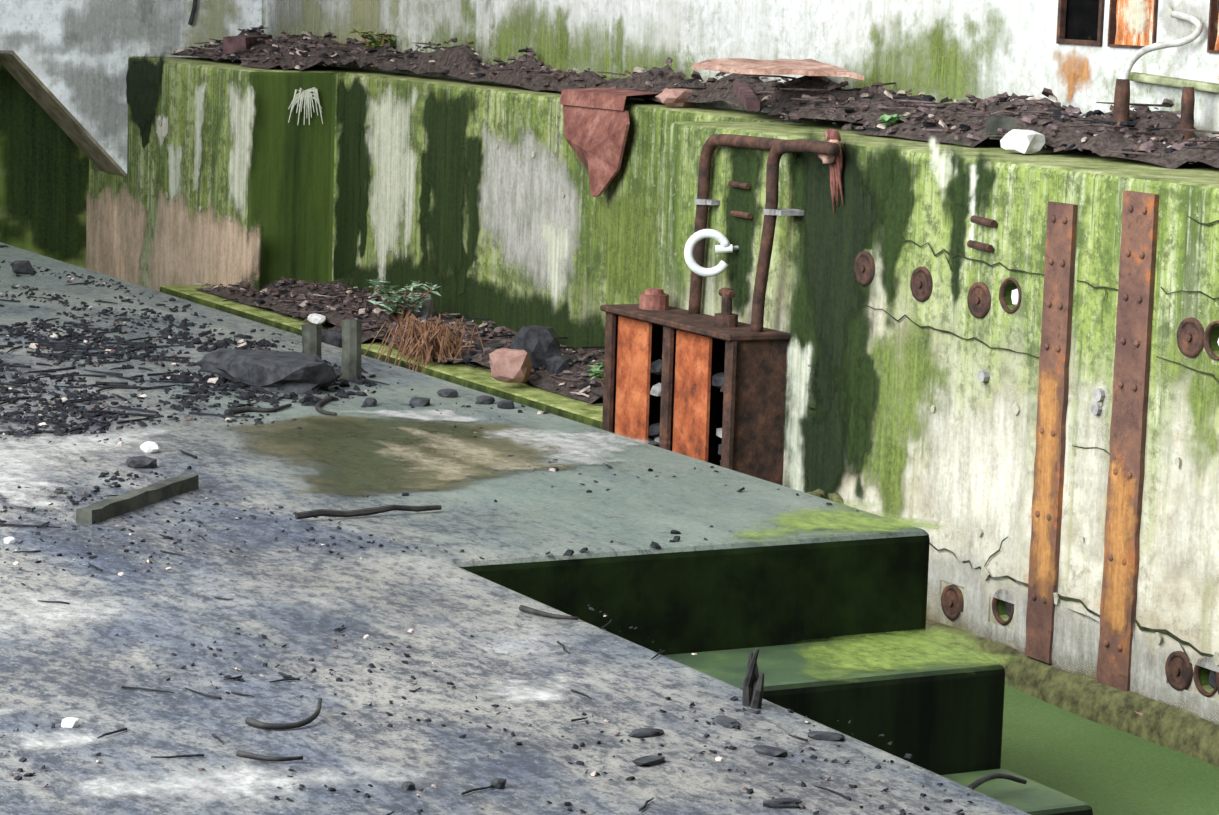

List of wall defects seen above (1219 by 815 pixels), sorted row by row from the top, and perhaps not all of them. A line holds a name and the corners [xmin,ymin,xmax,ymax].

damp [0,67,89,261]
efflorescence [194,84,206,187]
efflorescence [229,87,254,216]
damp [333,77,620,353]
damp [724,147,763,315]
damp [783,130,917,500]
efflorescence [375,410,475,422]
crack [930,537,1028,587]
corrosion [1032,376,1057,597]
crack [1058,594,1100,624]
corrosion [1105,463,1134,632]
crack [1134,617,1213,665]